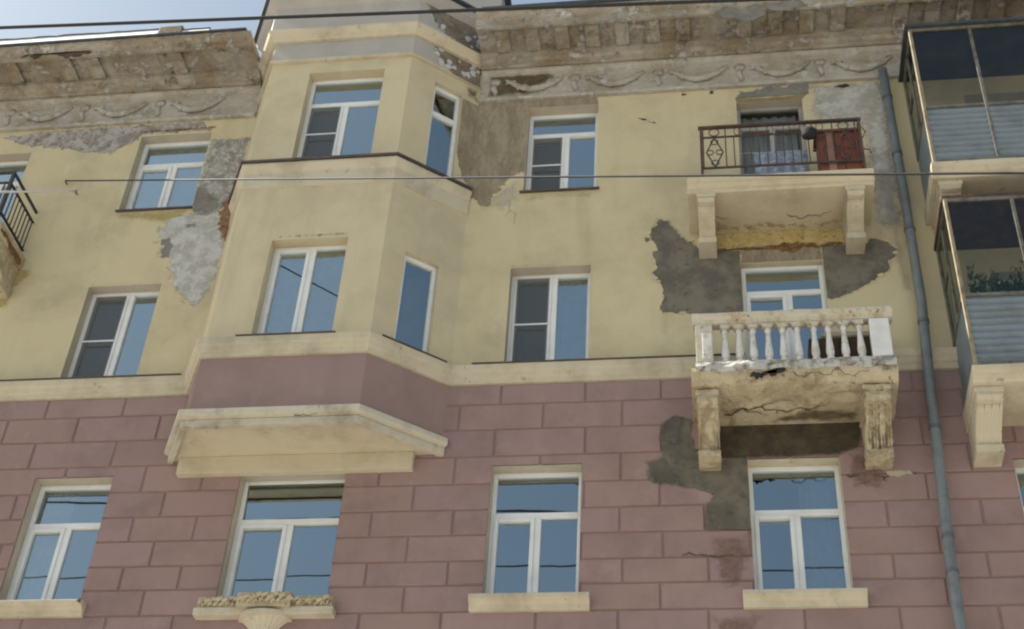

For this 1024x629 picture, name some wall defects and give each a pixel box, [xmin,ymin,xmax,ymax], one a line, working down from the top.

flaking render [427,3,598,209]
peeling [4,122,251,306]
flaking render [645,218,898,316]
spalling [750,367,786,380]
crack [793,368,860,378]
crack [724,400,842,416]
water stain [720,422,861,458]